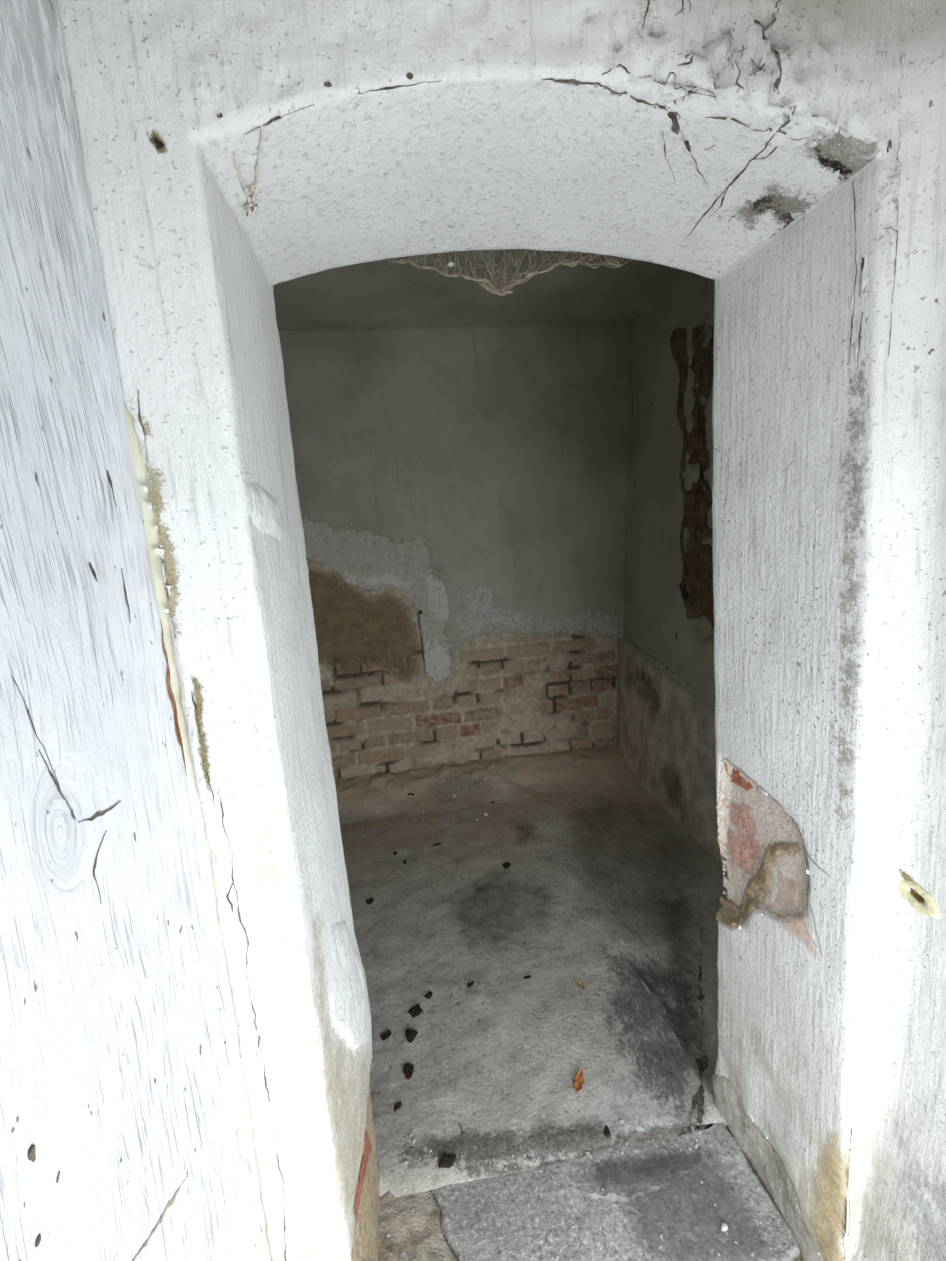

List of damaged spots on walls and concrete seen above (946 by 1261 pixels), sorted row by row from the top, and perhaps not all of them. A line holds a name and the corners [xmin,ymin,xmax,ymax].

crack [636,0,692,31]
crack [662,0,796,239]
flaking render [670,326,714,631]
flaking render [302,516,618,782]
flaking render [715,758,815,955]
damp [564,957,701,1146]